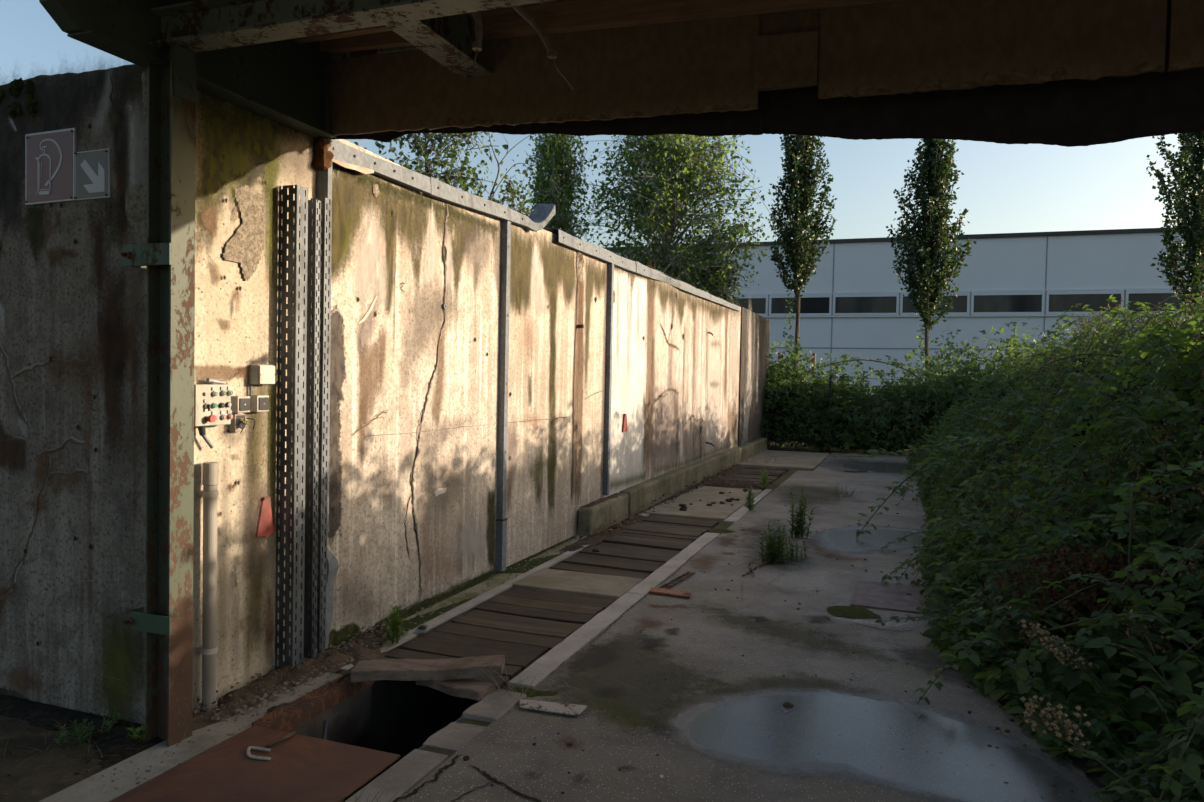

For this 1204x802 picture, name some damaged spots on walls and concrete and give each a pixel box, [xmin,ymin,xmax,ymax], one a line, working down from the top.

crack [394,265,405,341]
damp [412,221,478,289]
damp [517,246,556,357]
corrosion [0,422,71,490]
crack [2,435,84,596]
damp [328,384,343,545]
crack [351,409,389,436]
damp [360,334,386,458]
crack [404,203,449,602]
damp [603,275,655,465]
damp [720,314,758,439]
crack [393,754,541,802]